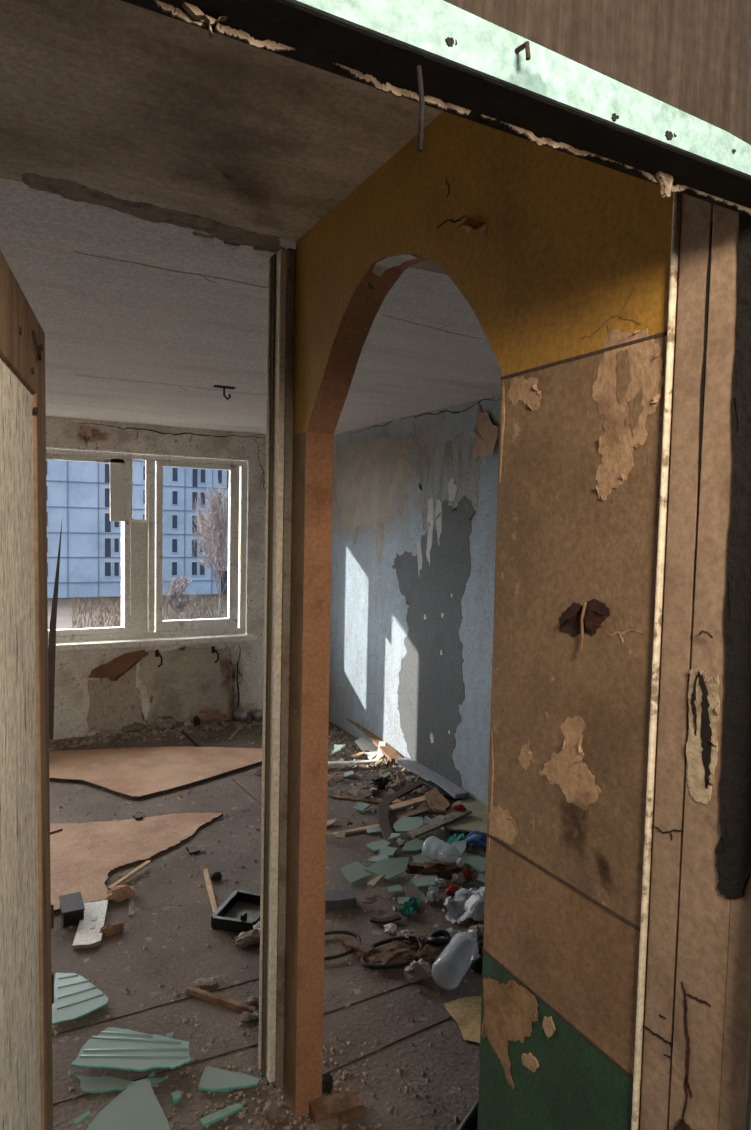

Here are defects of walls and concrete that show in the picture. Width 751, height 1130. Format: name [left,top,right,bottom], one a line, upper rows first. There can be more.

peeling [473,376,542,483]
peeling [592,328,665,501]
peeling [392,478,475,789]
peeling [518,716,601,810]
peeling [481,977,556,1089]
crack [643,982,711,1122]